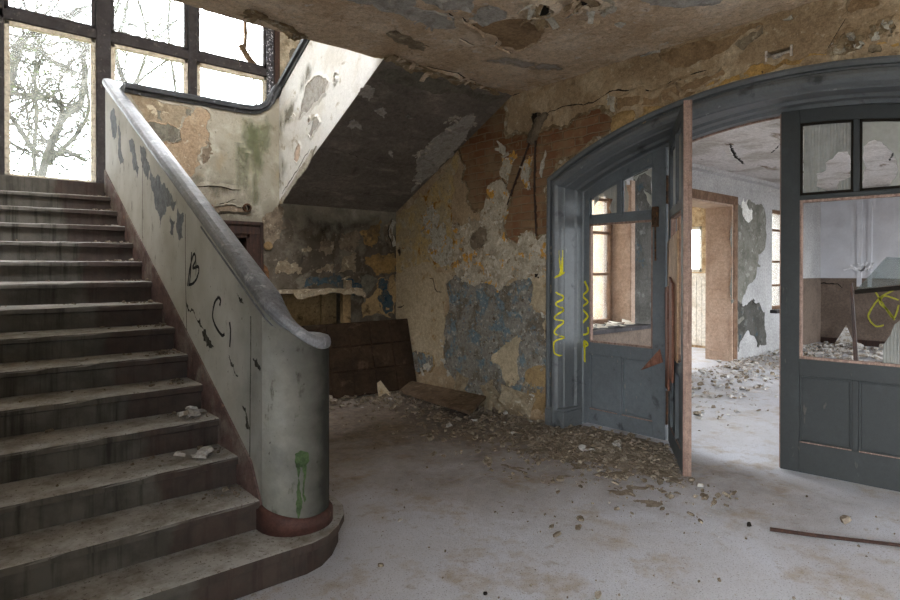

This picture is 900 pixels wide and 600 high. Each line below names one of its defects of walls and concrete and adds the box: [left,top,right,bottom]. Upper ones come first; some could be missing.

peeling [110,108,184,240]
peeling [127,93,213,179]
water stain [238,103,294,169]
peeling [262,70,339,250]
spalling [275,0,900,414]
crack [548,70,707,120]
crack [723,144,744,165]